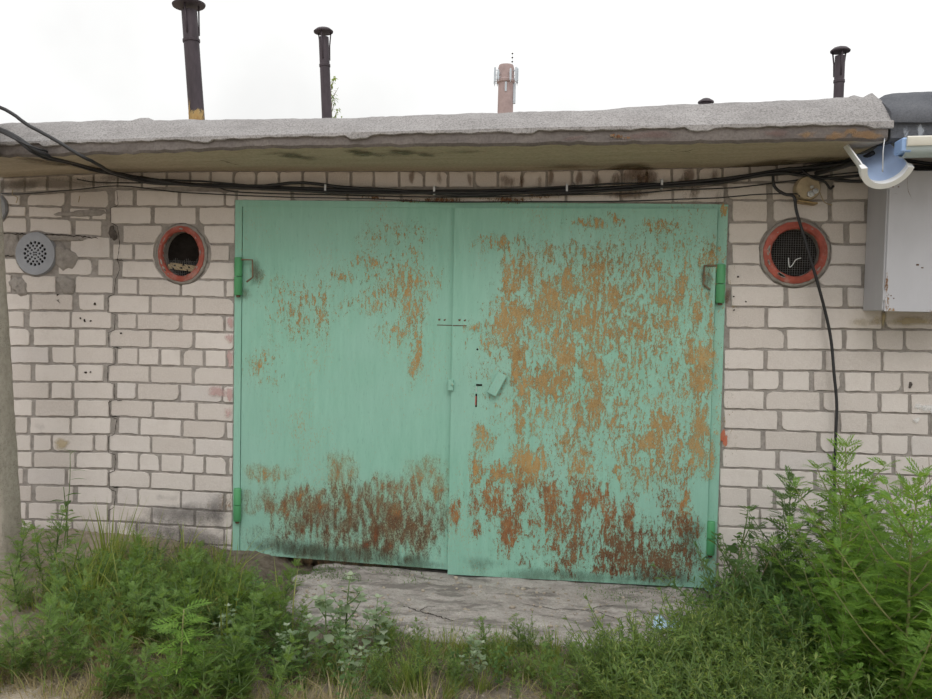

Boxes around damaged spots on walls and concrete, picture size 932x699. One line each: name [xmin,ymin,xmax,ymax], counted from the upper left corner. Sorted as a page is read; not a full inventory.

corrosion [242,197,735,583]